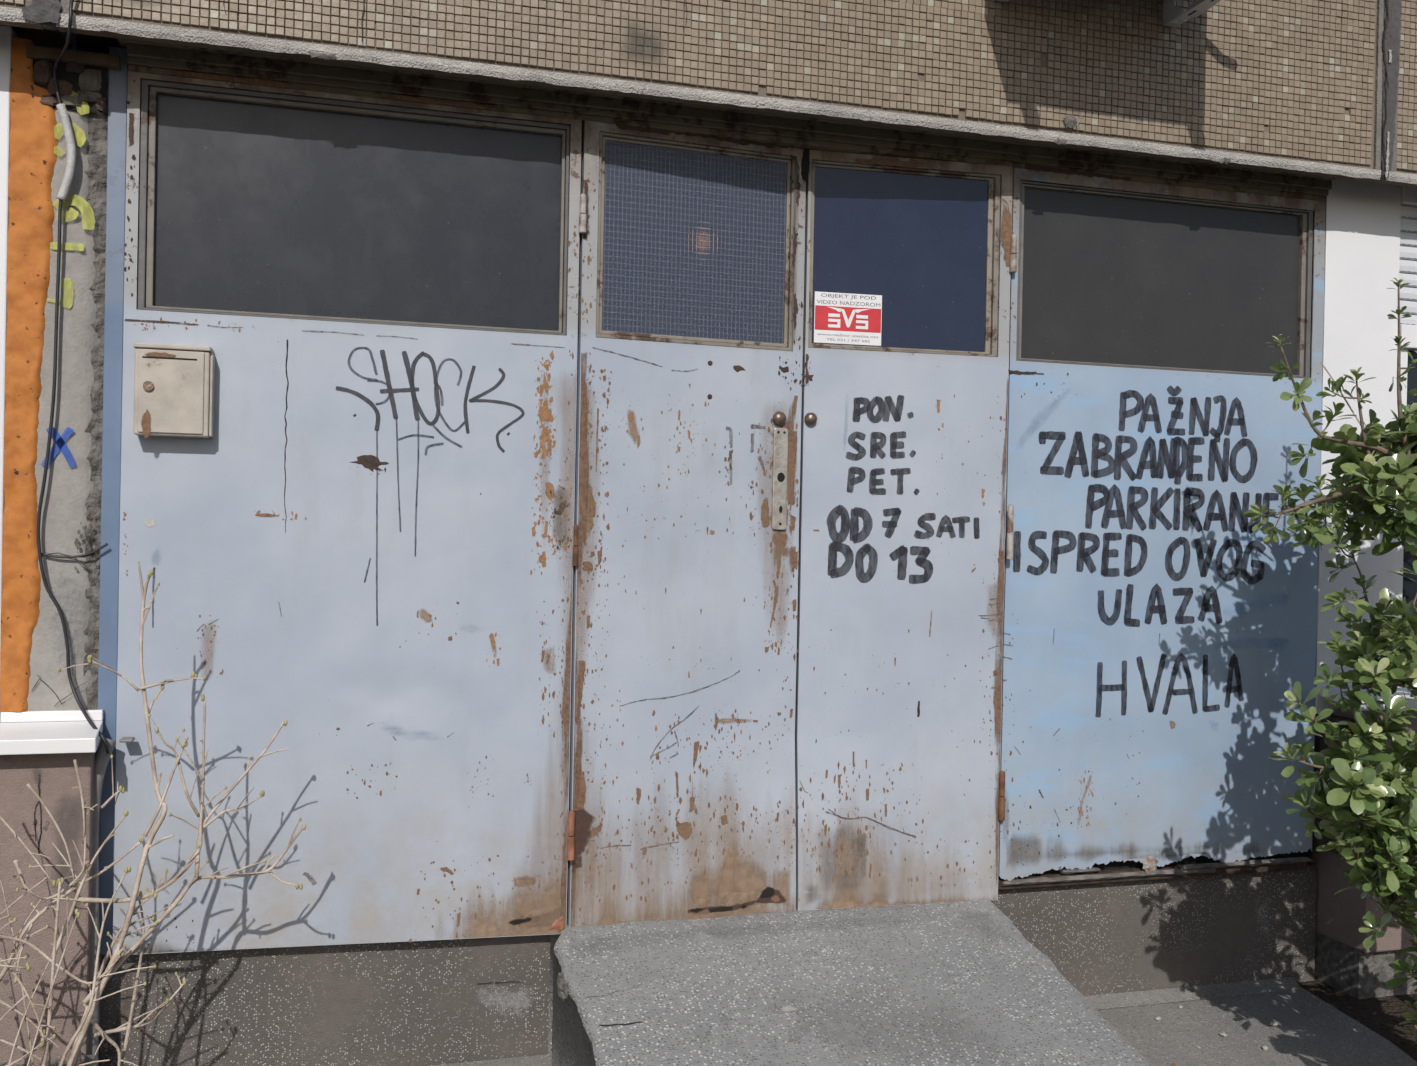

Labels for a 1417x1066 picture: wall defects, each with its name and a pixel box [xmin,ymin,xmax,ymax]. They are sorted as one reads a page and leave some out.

rust [610,121,794,157]
rust [125,317,241,332]
rust [409,343,1098,943]